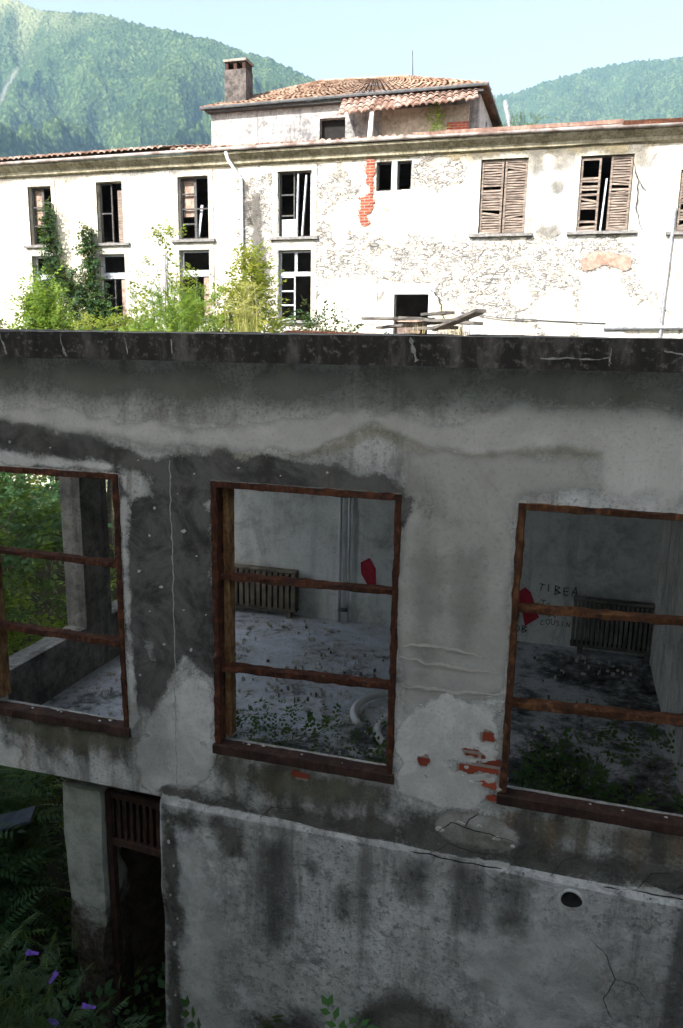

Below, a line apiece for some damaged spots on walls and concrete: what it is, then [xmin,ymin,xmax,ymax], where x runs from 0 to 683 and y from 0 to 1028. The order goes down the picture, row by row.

water stain [243,183,268,279]
flaking render [356,158,479,237]
flaking render [580,251,631,271]
water stain [0,358,683,411]
water stain [0,419,413,711]
peeling [395,692,502,812]
water stain [262,843,286,945]
crack [410,843,505,869]
crack [605,873,683,900]
water stain [359,992,456,1028]
crack [593,942,649,1027]